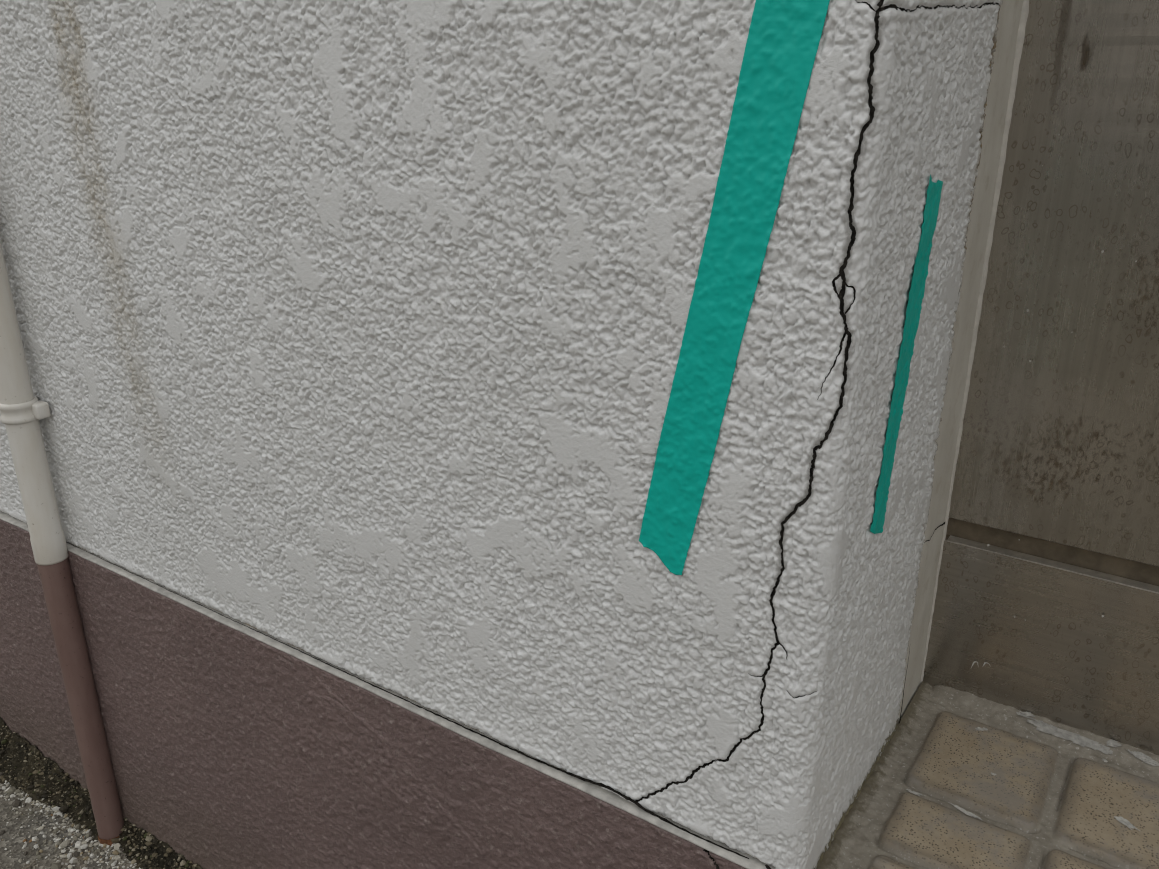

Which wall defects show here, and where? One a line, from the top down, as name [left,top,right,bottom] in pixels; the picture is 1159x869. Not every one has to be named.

crack [67,0,999,859]